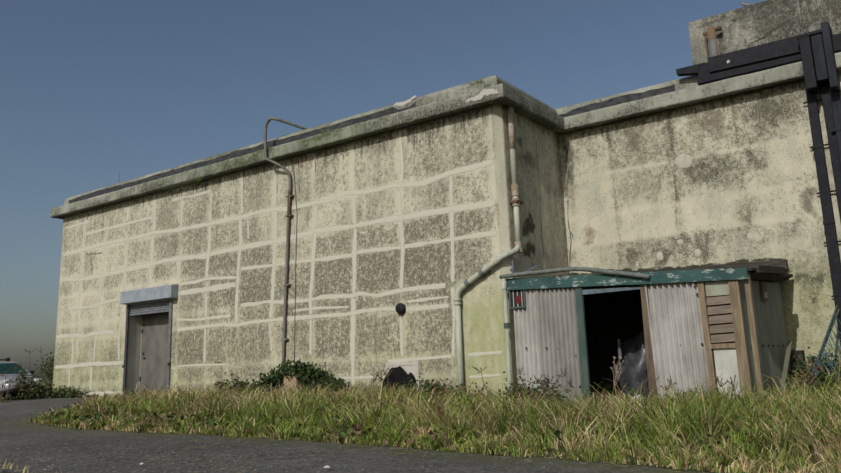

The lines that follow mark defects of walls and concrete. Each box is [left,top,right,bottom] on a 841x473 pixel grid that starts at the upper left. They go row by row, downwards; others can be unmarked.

spalling [465,88,499,103]
damp [685,154,726,186]
damp [523,212,535,257]
damp [656,230,712,265]